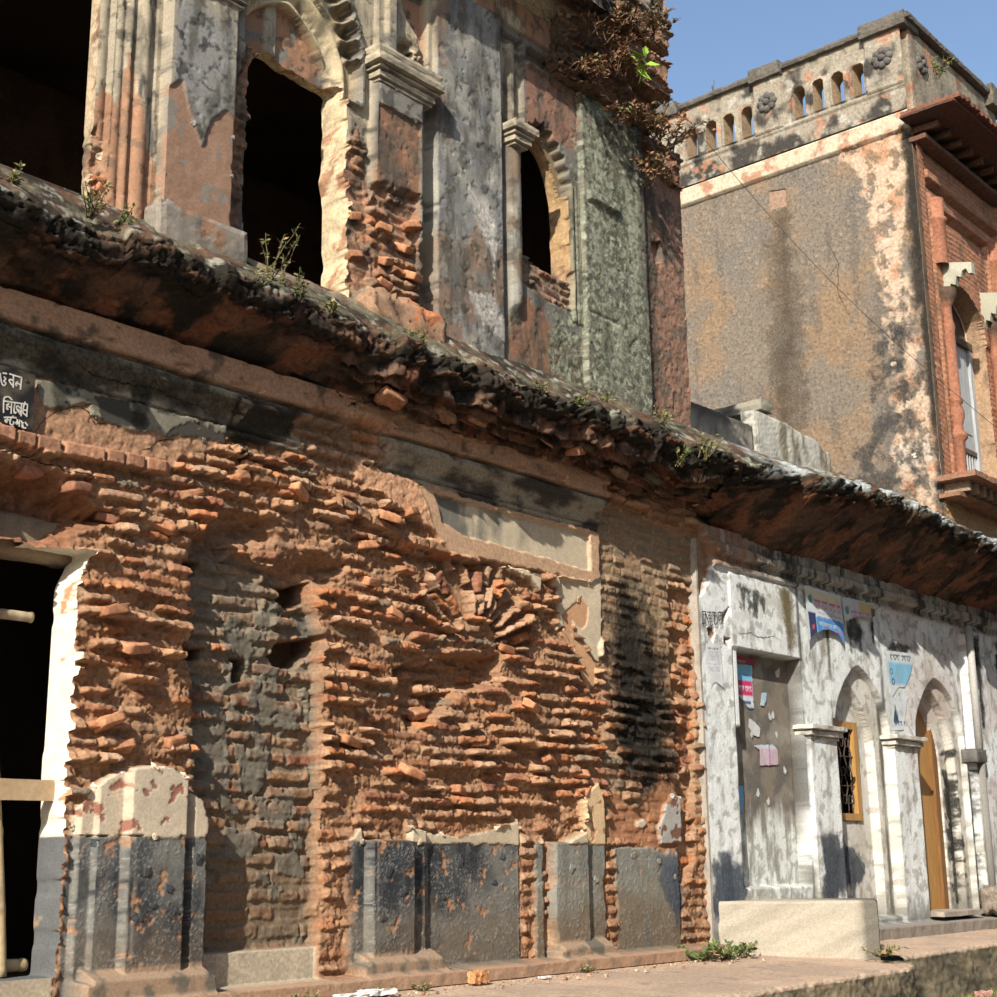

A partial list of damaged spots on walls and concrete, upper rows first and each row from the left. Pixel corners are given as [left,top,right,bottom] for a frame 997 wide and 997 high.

flaking render [87,48,256,230]
spalling [343,125,423,304]
flaking render [381,82,423,124]
damp [548,97,666,414]
damp [854,125,945,516]
spalling [0,379,707,997]
damp [736,583,765,618]
damp [847,619,874,652]
damp [974,636,985,728]
damp [712,852,748,922]
damp [821,833,865,898]
damp [939,749,980,903]